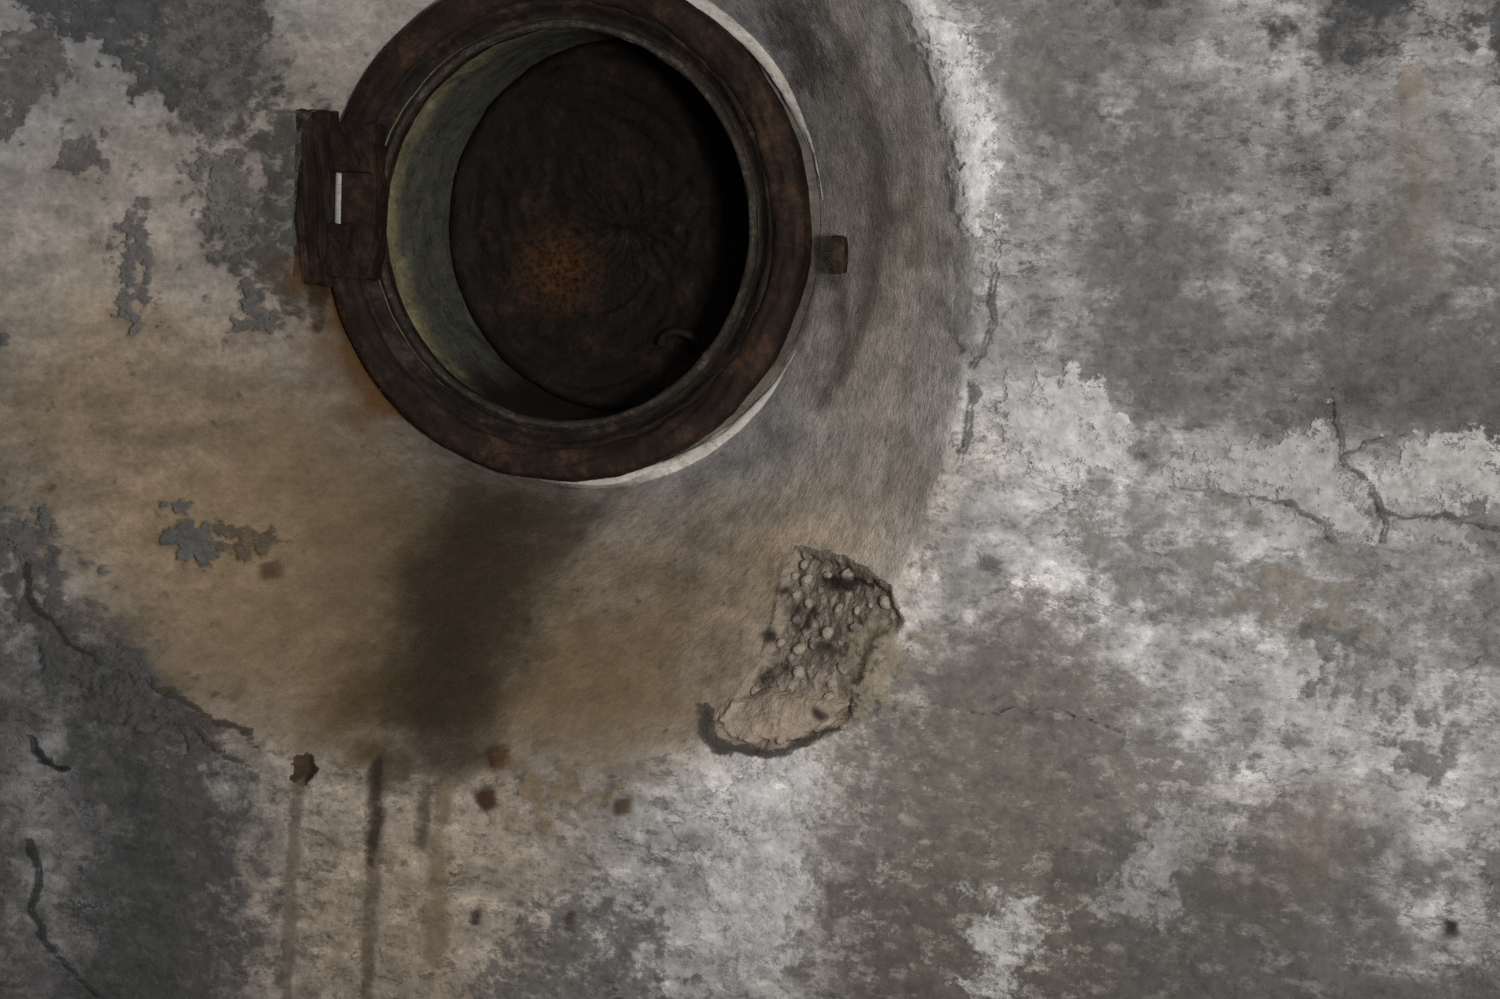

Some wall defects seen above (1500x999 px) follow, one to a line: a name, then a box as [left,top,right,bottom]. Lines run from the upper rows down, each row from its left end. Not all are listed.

rust [300,277,395,414]
crack [24,563,103,666]
peeling [155,498,293,577]
leakage [372,474,598,755]
spalling [703,545,923,759]
crack [30,735,71,772]
leakage [58,616,294,999]
crack [28,838,106,999]